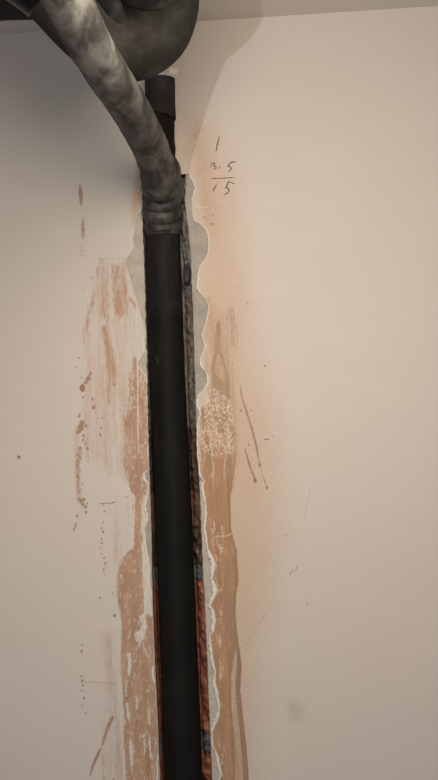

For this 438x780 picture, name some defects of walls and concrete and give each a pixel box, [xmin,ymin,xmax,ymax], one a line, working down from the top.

spalling [125,183,147,339]
corrosion [73,413,89,531]
spalling [138,349,148,385]
spalling [184,175,222,780]
water stain [175,94,304,780]
corrosion [90,715,114,776]